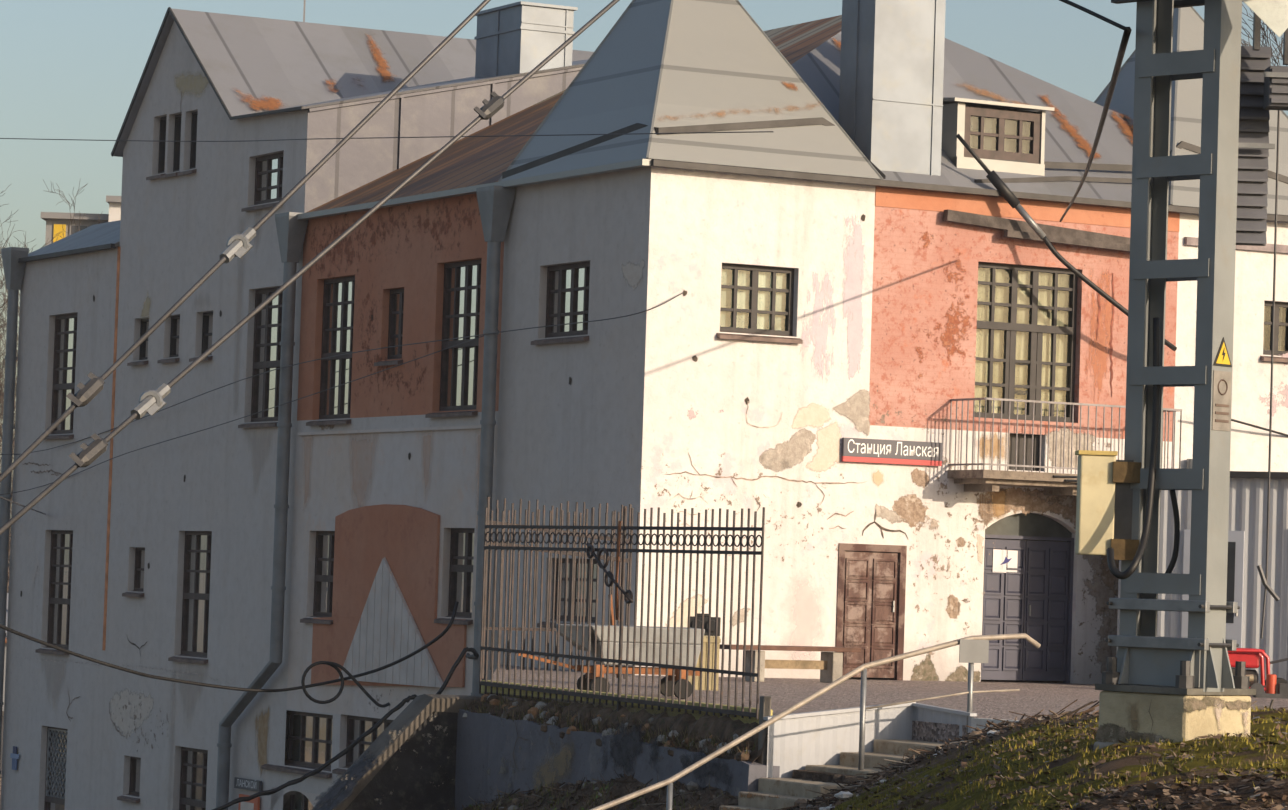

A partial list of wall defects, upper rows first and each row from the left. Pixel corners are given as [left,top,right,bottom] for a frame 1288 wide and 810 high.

corrosion [368,36,393,82]
corrosion [236,90,282,110]
corrosion [967,86,1101,158]
corrosion [1112,112,1133,142]
flaking render [914,232,977,378]
flaking render [758,214,950,488]
flaking render [1046,427,1121,468]
crack [667,453,908,539]
flaking render [875,456,1077,631]
flaking render [670,595,708,627]
flaking render [1074,555,1119,678]
flaking render [911,634,981,682]